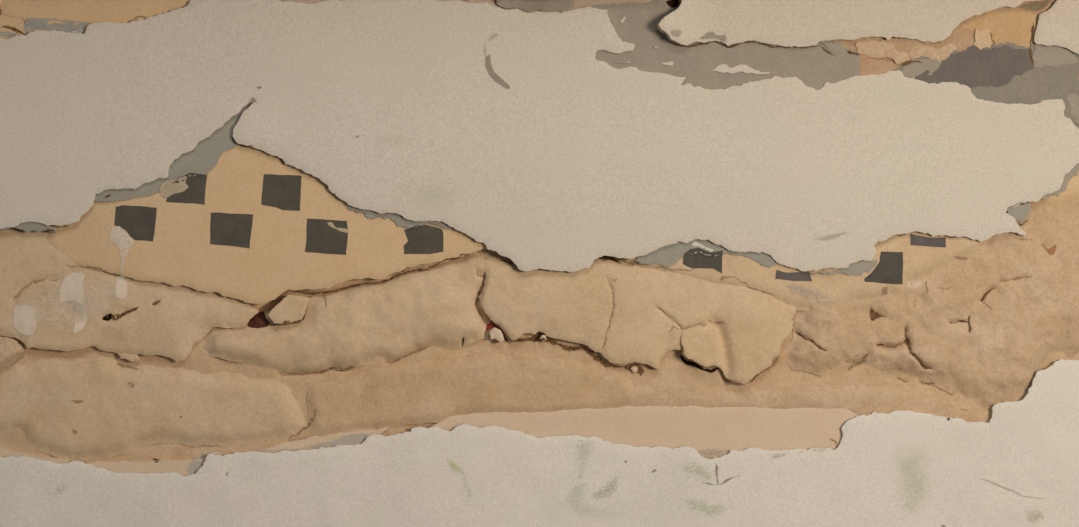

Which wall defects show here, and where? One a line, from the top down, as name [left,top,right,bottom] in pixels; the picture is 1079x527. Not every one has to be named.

spalling [0,0,190,39]
peeling [458,0,1079,128]
crack [259,253,694,370]
spalling [0,102,1079,476]
crack [656,307,779,386]
crack [792,316,827,351]
crack [848,281,950,385]
crack [949,277,1030,333]